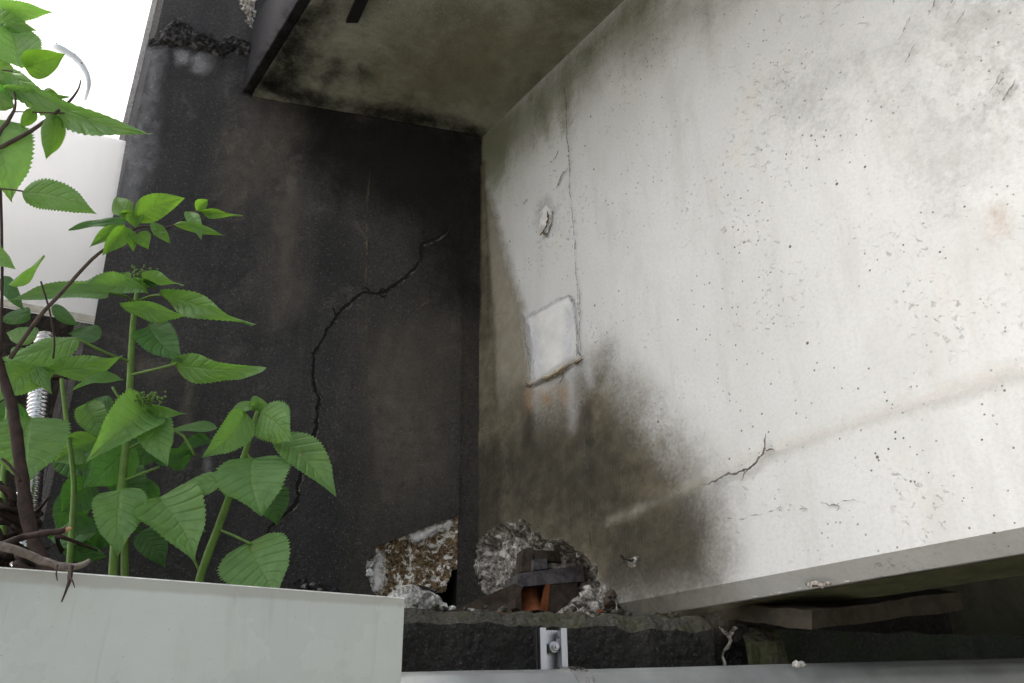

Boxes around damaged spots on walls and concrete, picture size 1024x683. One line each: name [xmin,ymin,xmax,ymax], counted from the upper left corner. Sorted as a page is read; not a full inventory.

crack [311,214,460,438]
crack [523,68,592,556]
damp [478,163,712,598]
crack [267,471,305,534]
crack [703,434,775,485]
spalling [366,516,458,596]
spalling [473,519,621,617]